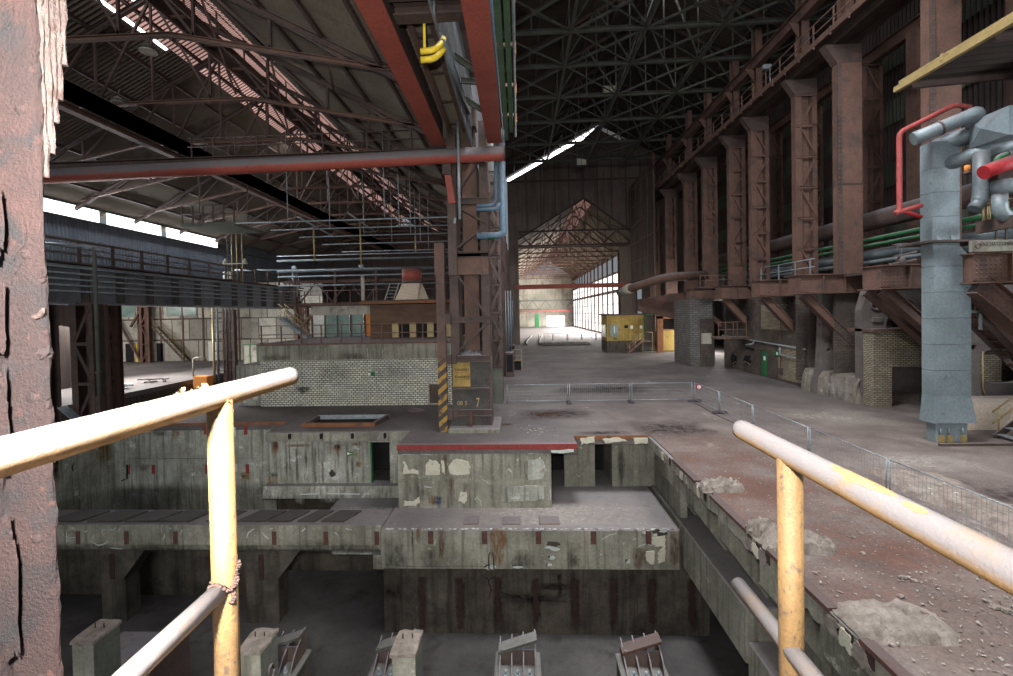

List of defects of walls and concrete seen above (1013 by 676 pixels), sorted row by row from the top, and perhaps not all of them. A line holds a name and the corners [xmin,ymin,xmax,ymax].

peeling [402,454,471,476]
peeling [501,453,551,503]
spalling [550,436,648,454]
spalling [659,450,745,501]
spalling [745,516,777,566]
spalling [804,528,838,556]